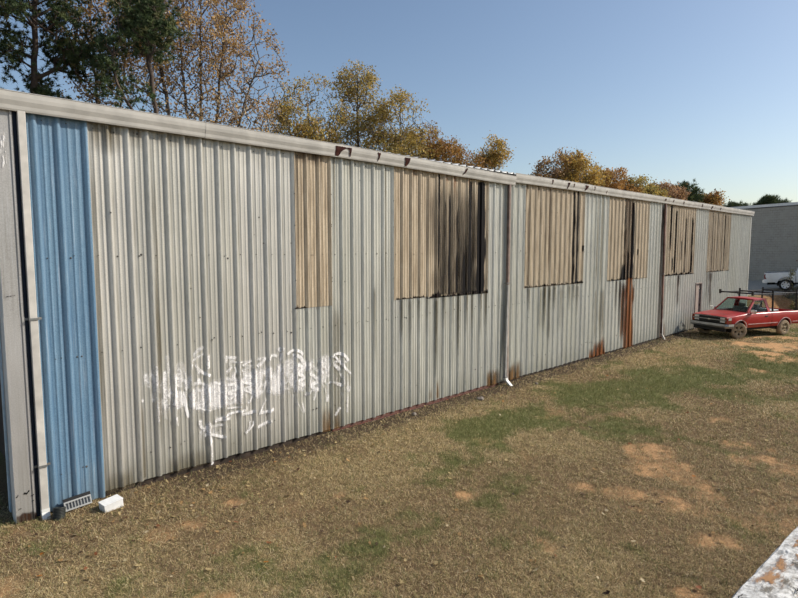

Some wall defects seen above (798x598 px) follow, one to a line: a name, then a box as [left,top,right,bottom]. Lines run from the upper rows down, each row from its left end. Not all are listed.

water stain [396,174,488,300]
water stain [524,191,584,288]
water stain [607,203,638,281]
rust [616,200,635,348]
water stain [664,205,694,276]
rust [589,331,605,358]